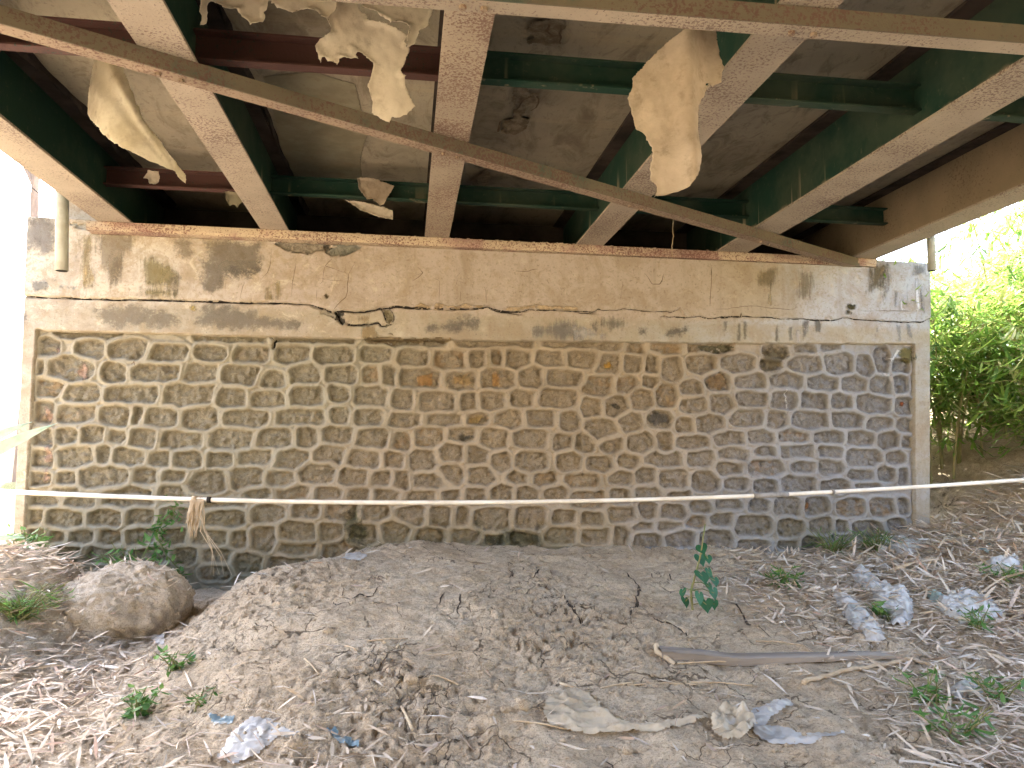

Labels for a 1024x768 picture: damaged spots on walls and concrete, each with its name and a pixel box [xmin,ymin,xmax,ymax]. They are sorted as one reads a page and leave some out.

leakage [32,281,74,292]
leakage [101,235,131,284]
leakage [202,241,260,292]
crack [18,260,930,327]